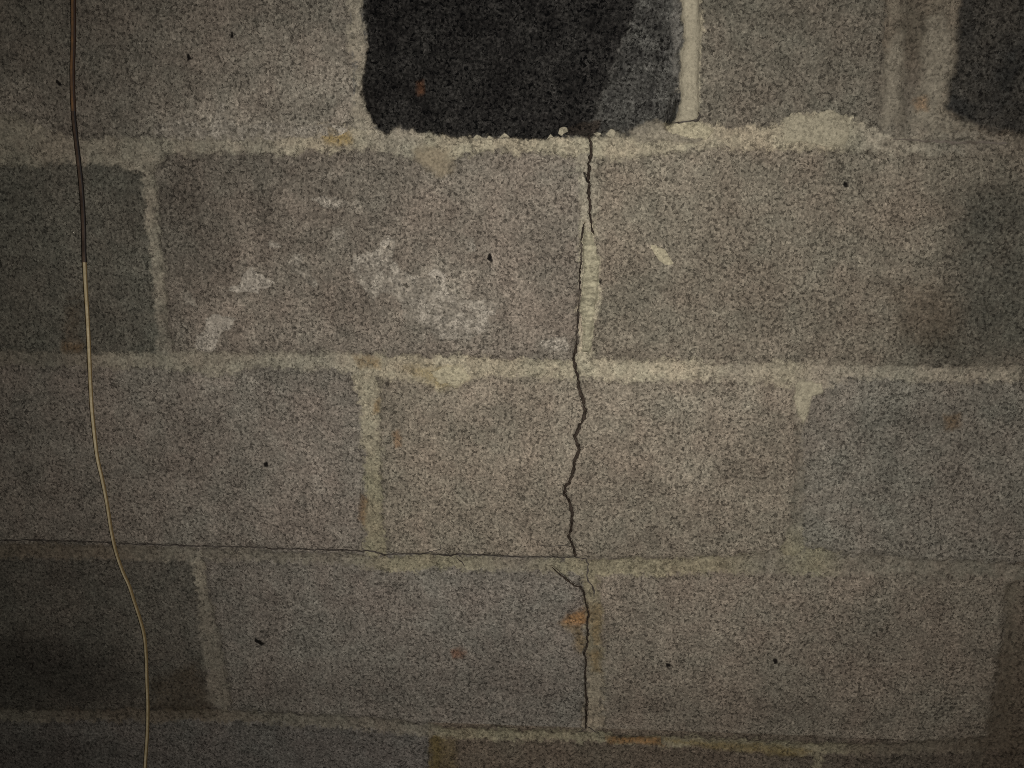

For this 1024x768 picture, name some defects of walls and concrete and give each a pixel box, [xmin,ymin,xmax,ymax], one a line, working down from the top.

water stain [360,0,682,141]
crack [0,135,599,733]